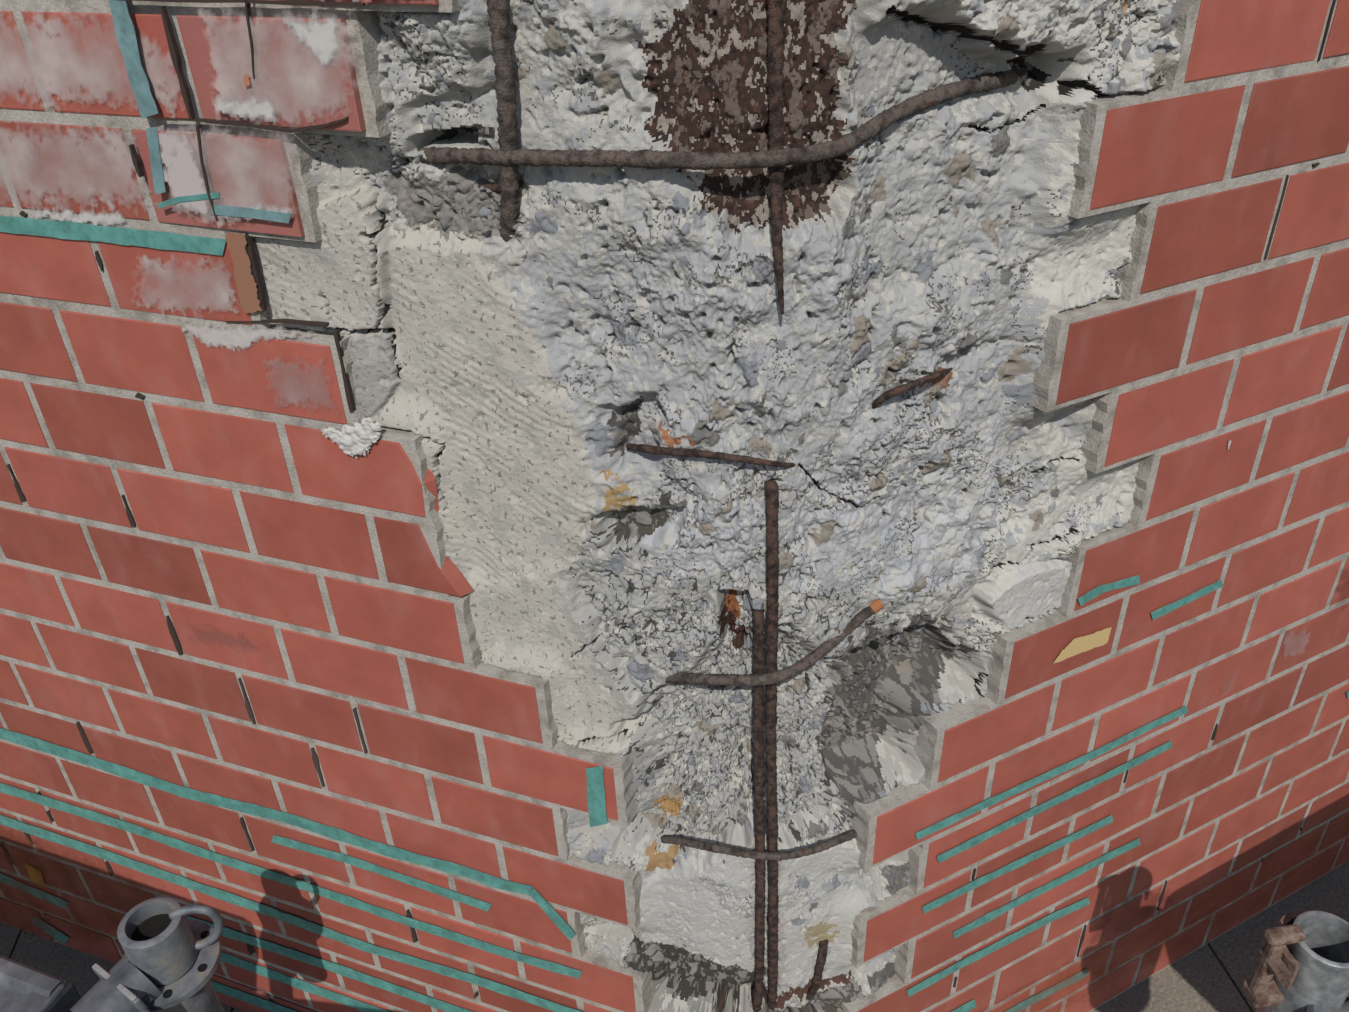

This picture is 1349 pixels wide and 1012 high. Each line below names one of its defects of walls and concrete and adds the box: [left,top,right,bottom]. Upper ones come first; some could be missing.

efflorescence [211,14,357,122]
corrosion [638,0,857,234]
crack [886,5,1109,133]
efflorescence [0,128,135,226]
efflorescence [158,130,291,226]
crack [129,0,402,413]
efflorescence [182,277,309,352]
peeling [251,0,1182,926]
corrosion [714,589,752,650]
spalling [585,912,899,1012]
corrosion [711,970,854,1012]
corrosion [802,915,840,949]